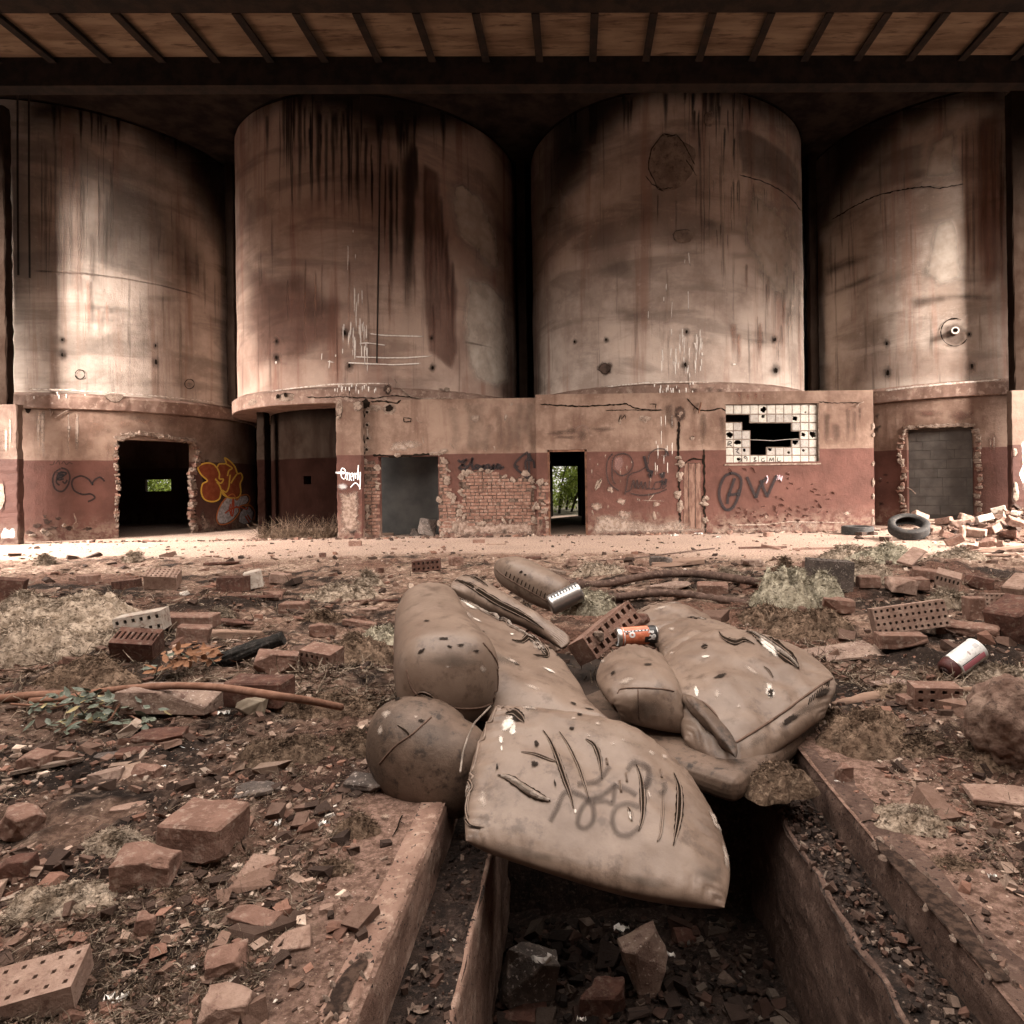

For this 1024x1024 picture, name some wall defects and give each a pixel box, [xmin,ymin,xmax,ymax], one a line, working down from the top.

damp [283,95,418,277]
spalling [647,133,697,191]
flaking render [429,449,550,537]
crack [541,399,726,533]